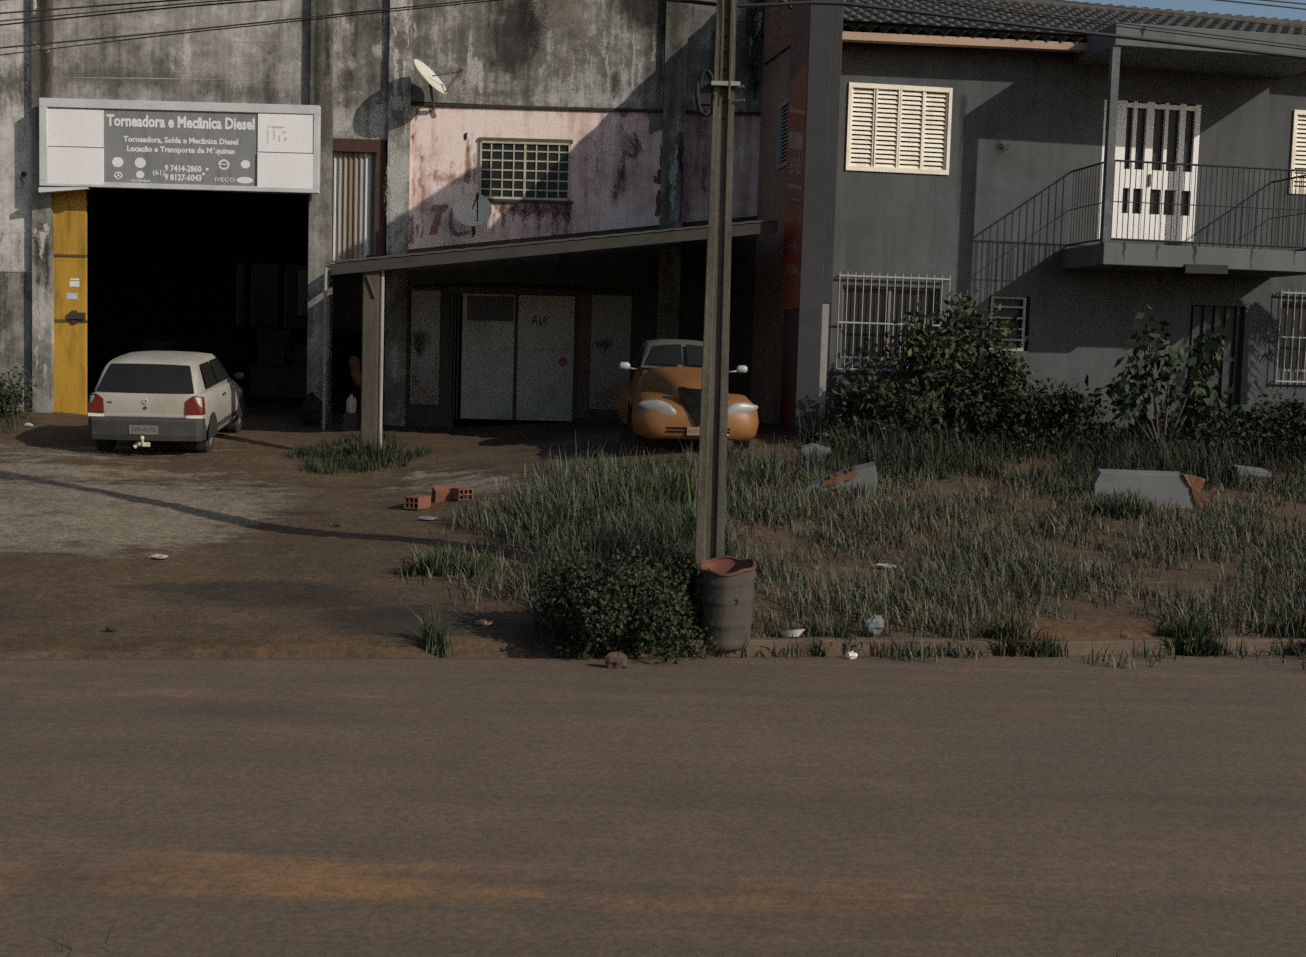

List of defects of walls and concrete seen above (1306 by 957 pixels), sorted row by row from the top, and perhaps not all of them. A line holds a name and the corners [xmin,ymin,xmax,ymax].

leakage [40,0,48,96]
leakage [468,0,540,93]
leakage [559,0,657,107]